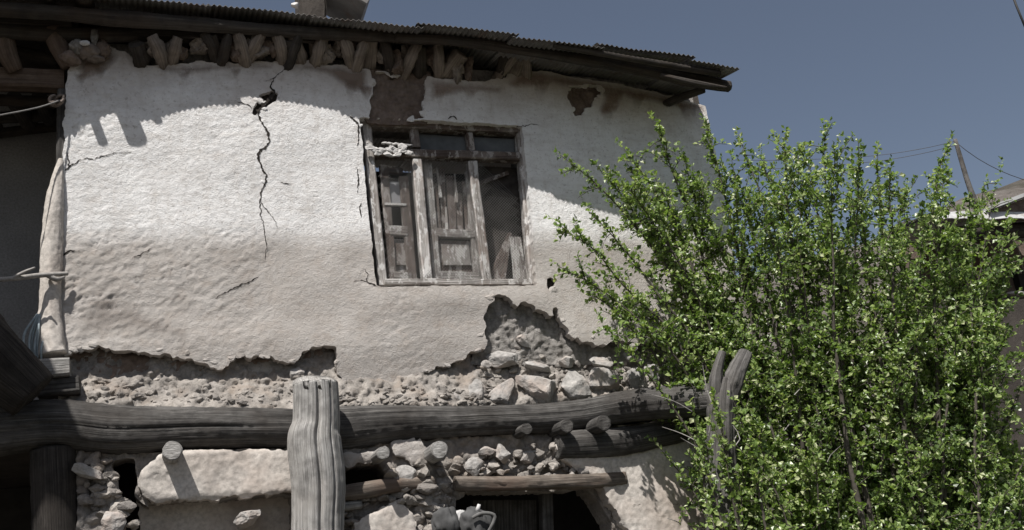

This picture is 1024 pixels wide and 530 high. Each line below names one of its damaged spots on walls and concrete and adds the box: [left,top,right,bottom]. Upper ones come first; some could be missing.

flaking render [364,69,431,127]
flaking render [567,83,603,116]
crack [215,71,288,299]
flaking render [471,293,639,368]
flaking render [68,341,190,378]
flaking render [199,353,273,371]
flaking render [288,348,340,365]